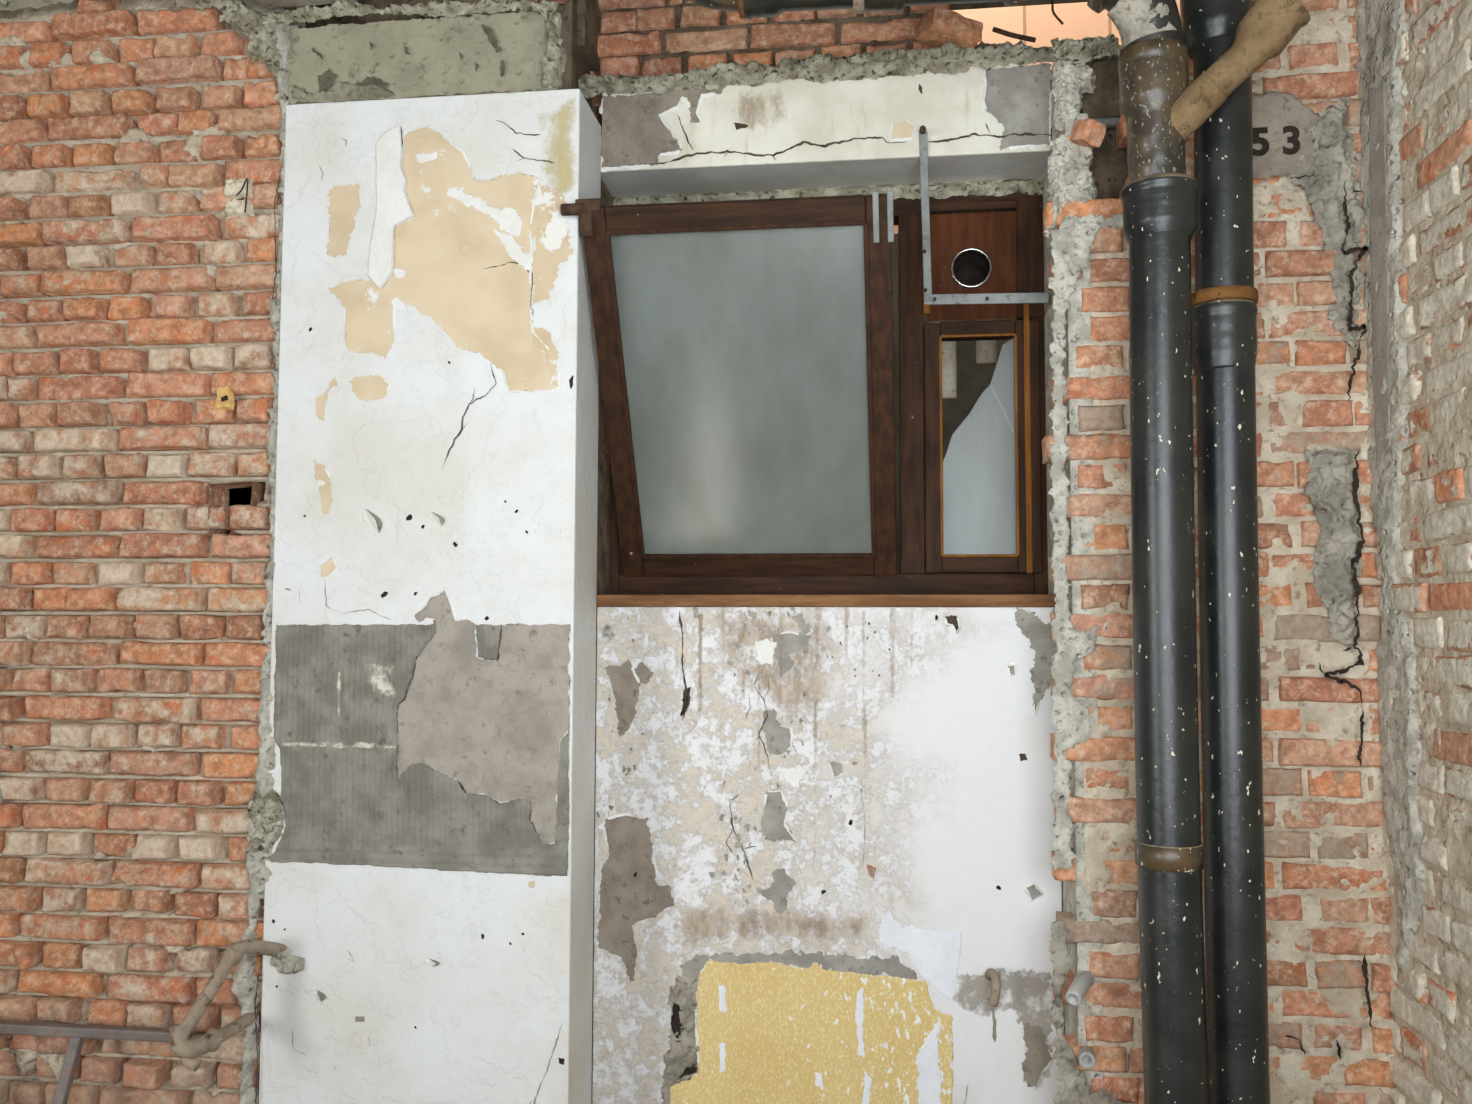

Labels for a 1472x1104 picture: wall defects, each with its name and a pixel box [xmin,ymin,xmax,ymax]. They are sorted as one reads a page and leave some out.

crack [624,114,1052,169]
crack [1294,172,1369,401]
crack [442,367,496,468]
spalling [130,0,1123,1104]
crack [1319,449,1365,766]